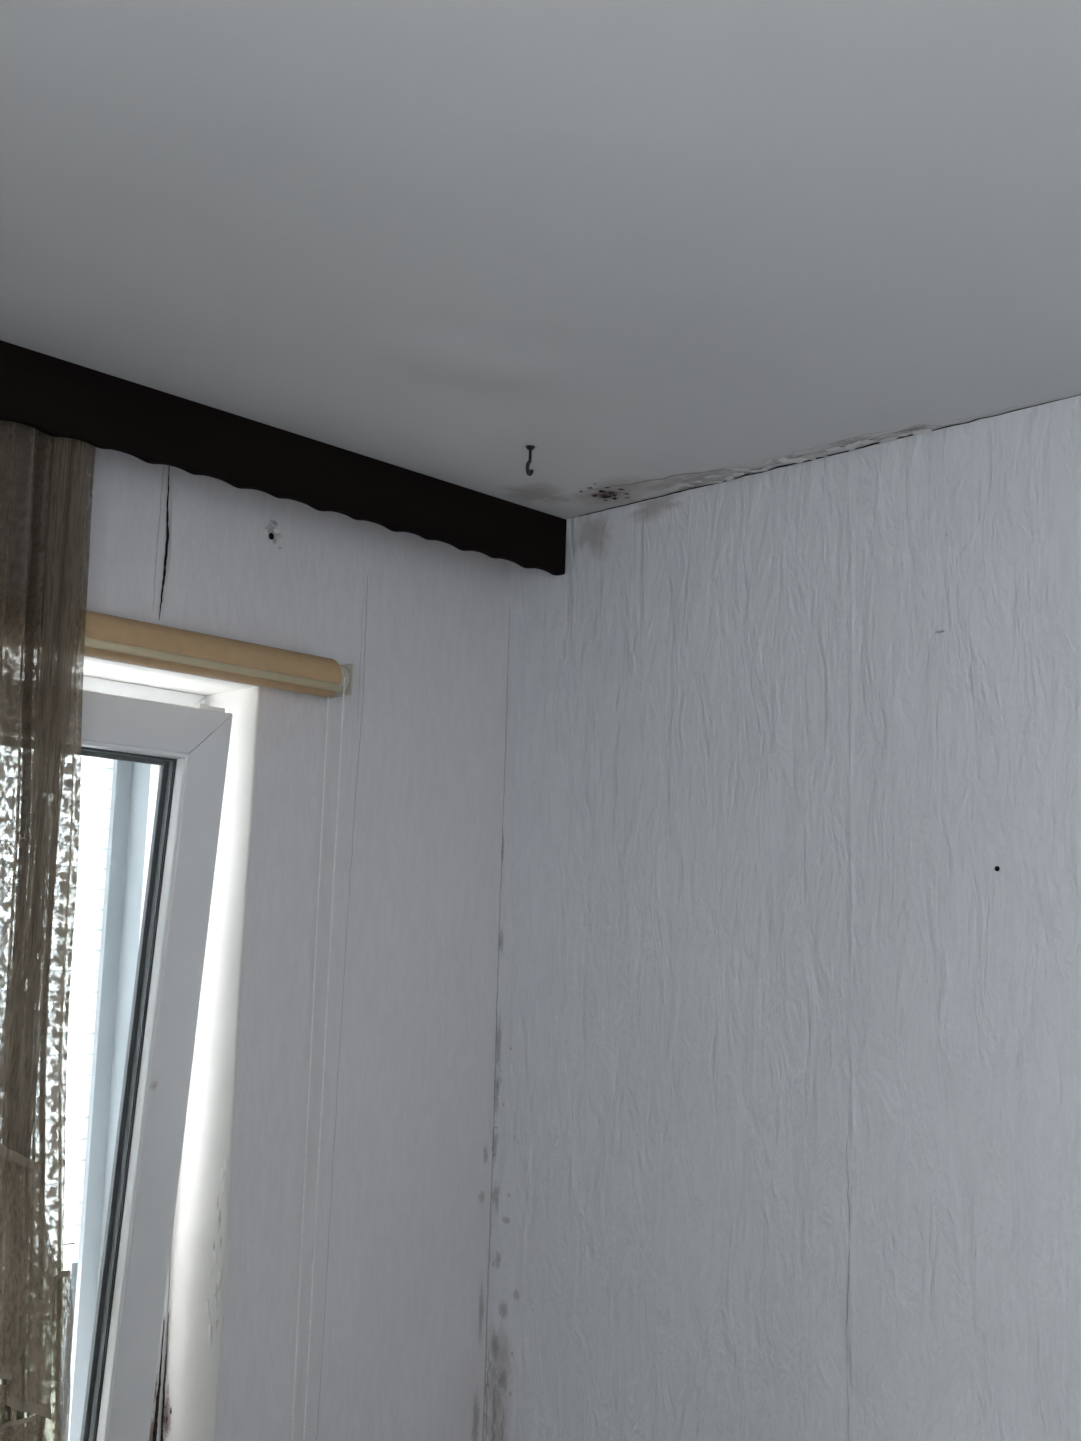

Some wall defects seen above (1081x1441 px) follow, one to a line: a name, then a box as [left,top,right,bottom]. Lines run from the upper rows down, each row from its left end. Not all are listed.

crack [159,466,175,618]
water stain [580,483,629,501]
water stain [149,1312,172,1441]